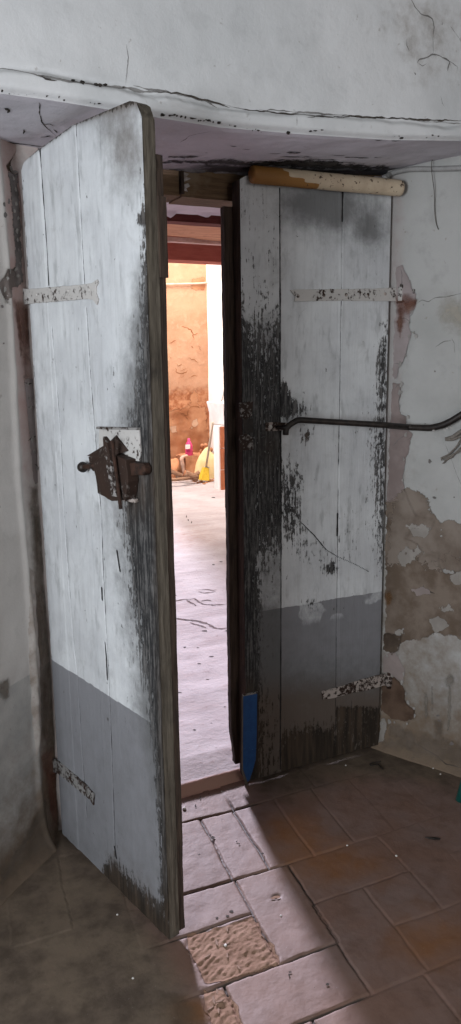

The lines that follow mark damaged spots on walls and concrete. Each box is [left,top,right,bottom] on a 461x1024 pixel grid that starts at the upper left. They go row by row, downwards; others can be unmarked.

crack [407,1,459,75]
crack [0,44,461,147]
spalling [378,265,461,743]